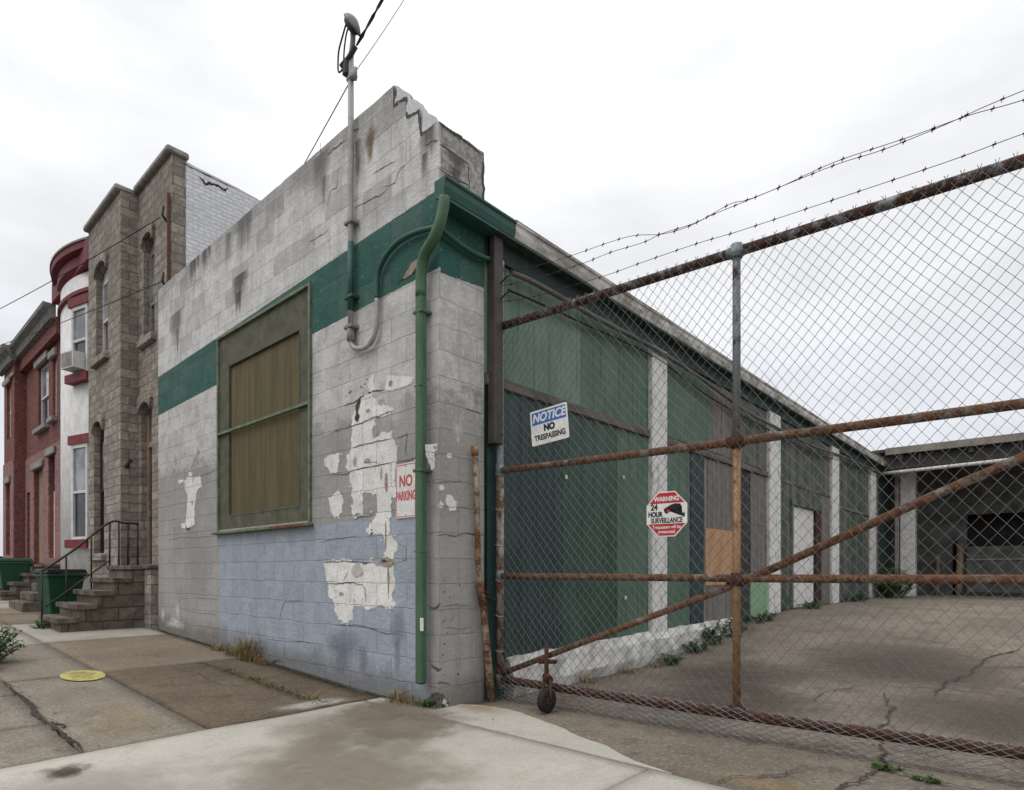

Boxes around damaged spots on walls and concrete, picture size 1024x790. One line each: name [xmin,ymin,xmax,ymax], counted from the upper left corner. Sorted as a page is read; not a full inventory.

crack [183,163,231,191]
crack [354,161,404,209]
peeling [425,444,452,470]
peeling [178,472,202,530]
peeling [323,372,414,625]
peeling [437,485,457,511]
crack [933,649,1024,700]
crack [2,680,84,752]